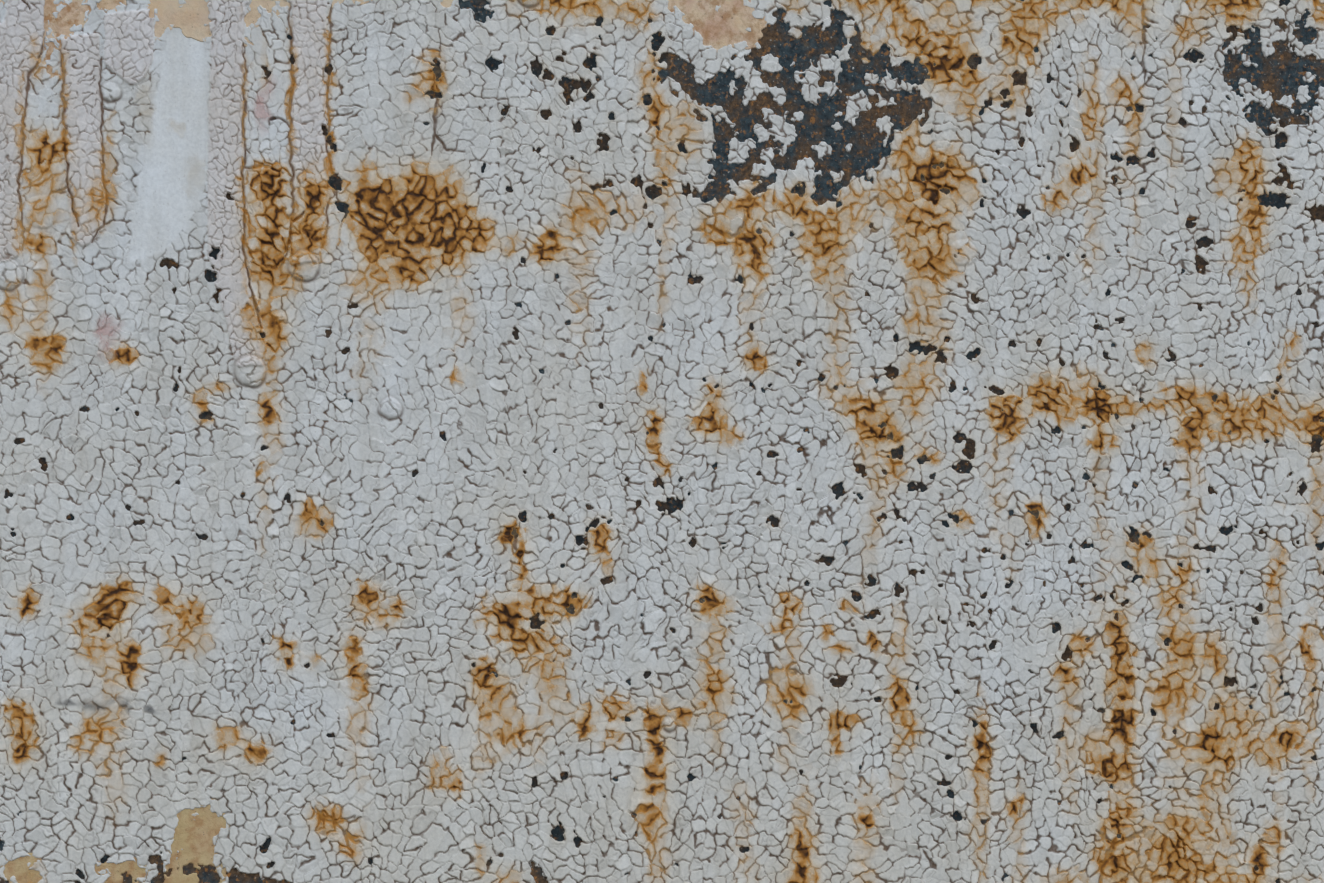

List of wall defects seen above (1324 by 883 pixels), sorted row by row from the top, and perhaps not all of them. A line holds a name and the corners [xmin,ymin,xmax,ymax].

rust [236,30,495,374]
peeling [525,53,597,105]
crack [646,0,740,82]
peeling [642,0,932,208]
crack [752,0,923,66]
rust [699,120,977,343]
peeling [1222,0,1324,222]
peeling [551,822,583,848]
rust [471,520,732,875]
crack [618,762,649,795]
rust [1053,534,1315,883]
crack [1280,865,1323,883]